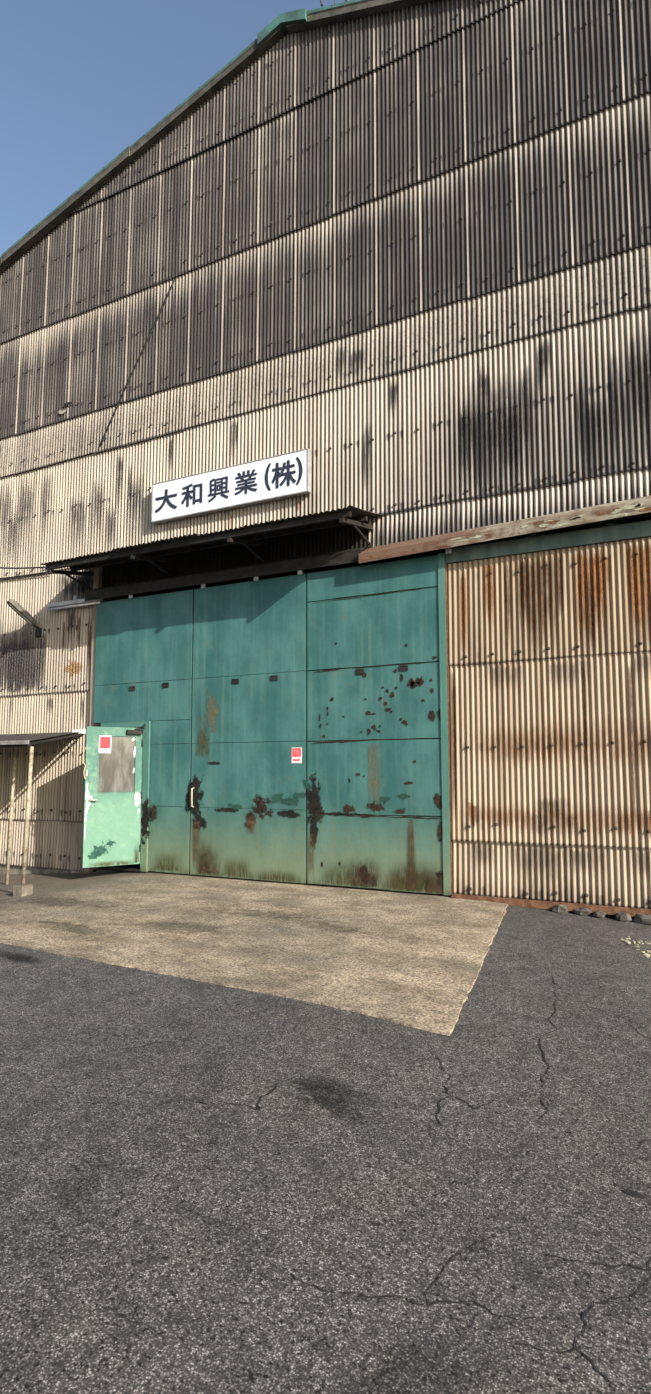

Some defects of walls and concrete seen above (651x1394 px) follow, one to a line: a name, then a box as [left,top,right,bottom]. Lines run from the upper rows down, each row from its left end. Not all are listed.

leakage [460,345,550,469]
leakage [577,354,651,451]
leakage [0,491,50,541]
leakage [73,495,115,535]
leakage [116,461,140,524]
corrosion [532,504,651,528]
corrosion [484,552,611,642]
corrosion [628,545,651,631]
leakage [0,641,46,689]
leakage [65,662,82,676]
corrosion [428,679,476,841]
corrosion [328,778,444,893]